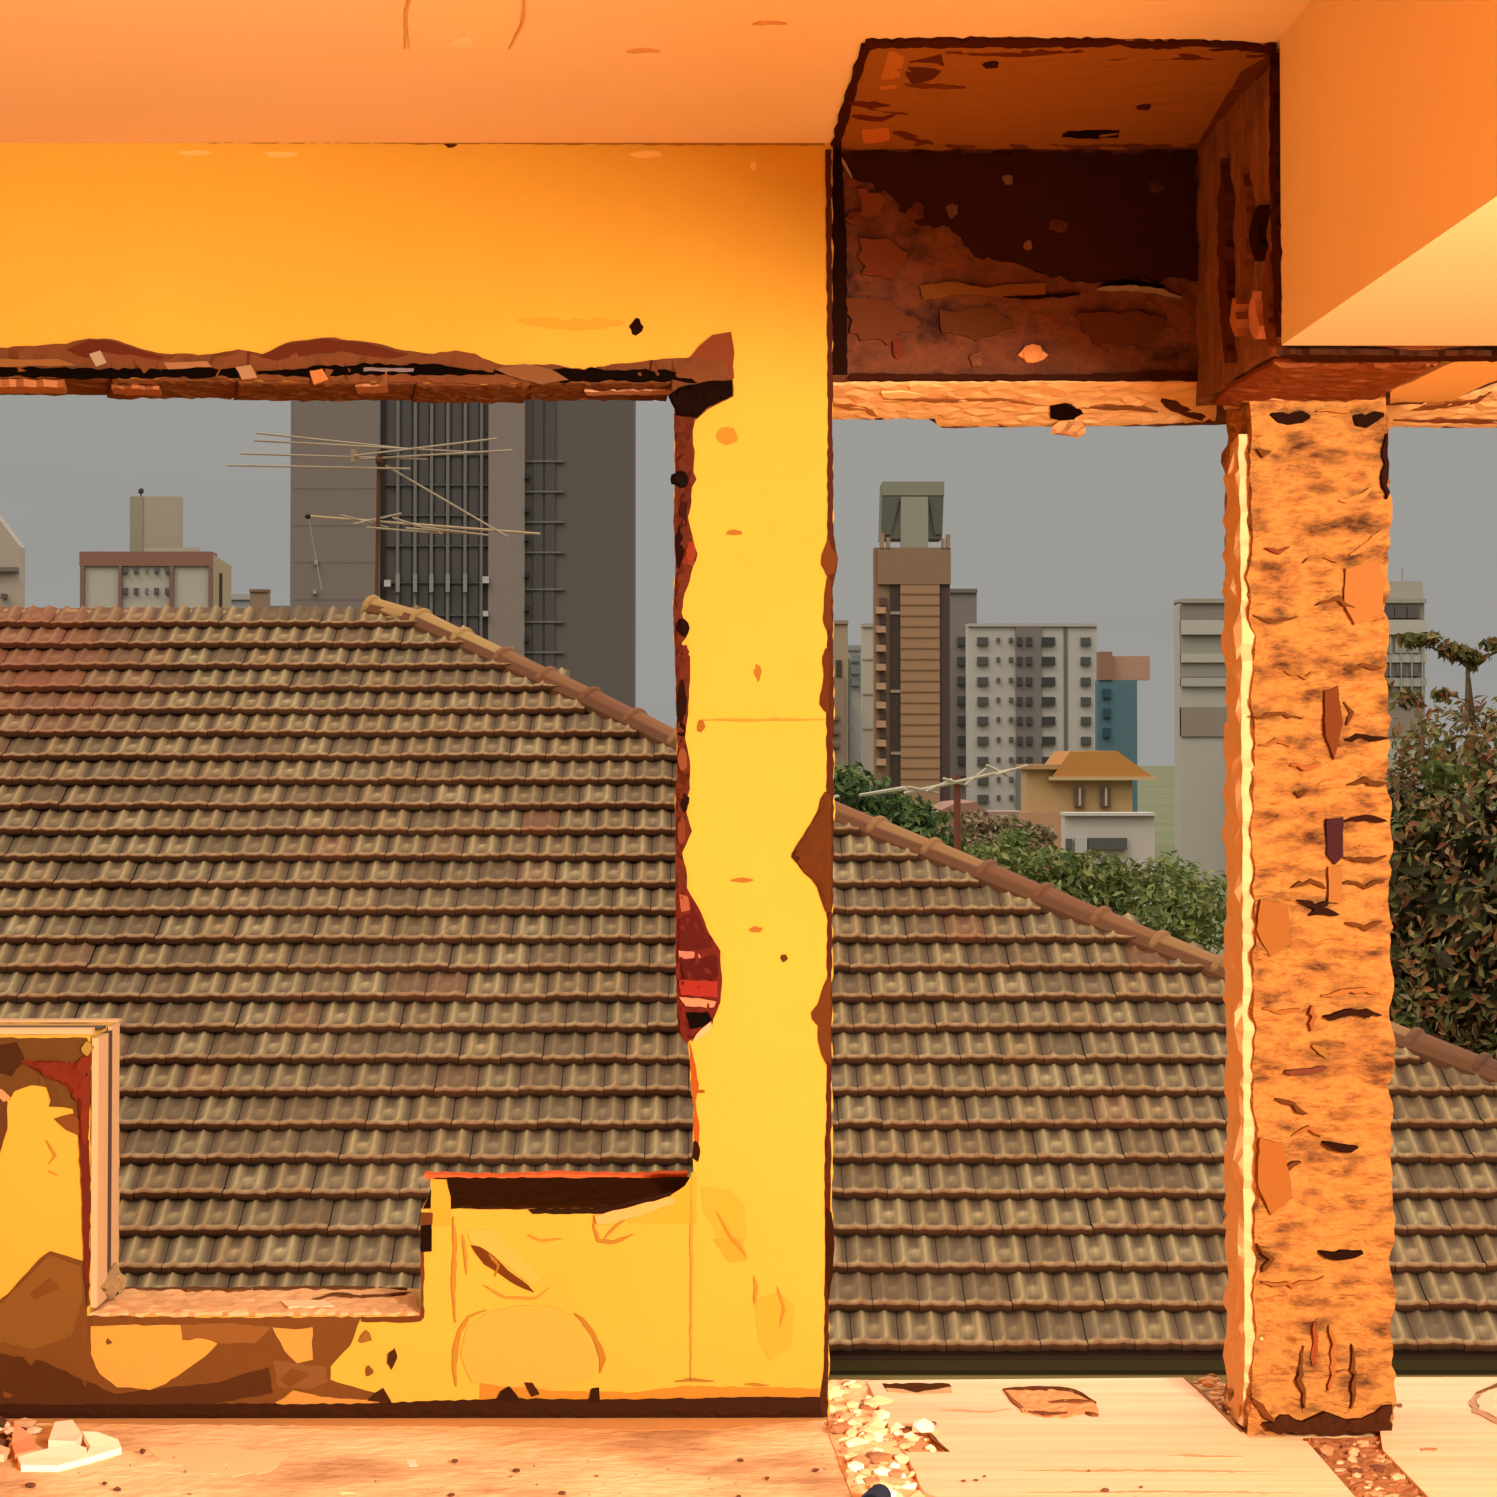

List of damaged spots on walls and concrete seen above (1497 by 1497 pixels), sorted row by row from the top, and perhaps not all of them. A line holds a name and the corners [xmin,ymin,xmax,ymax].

spalling [0,332,734,1043]
spalling [792,36,1497,1417]
peeling [0,1037,700,1404]
spalling [1250,1397,1275,1422]